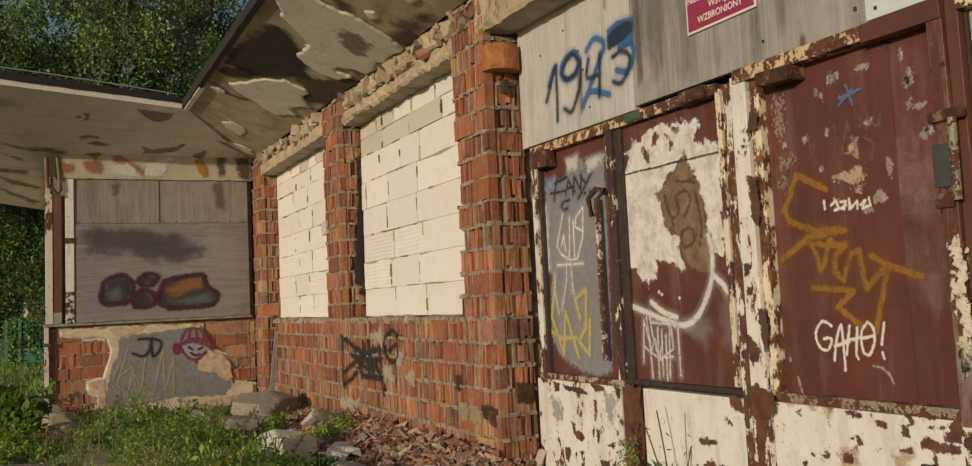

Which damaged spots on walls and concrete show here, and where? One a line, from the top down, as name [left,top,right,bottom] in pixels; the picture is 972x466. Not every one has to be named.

leakage [218,24,359,104]
peeling [275,0,467,116]
peeling [210,78,321,162]
leakage [0,169,40,203]
leakage [217,158,250,180]
peeling [946,234,972,380]
peeling [57,323,257,419]
corrosion [597,430,618,466]